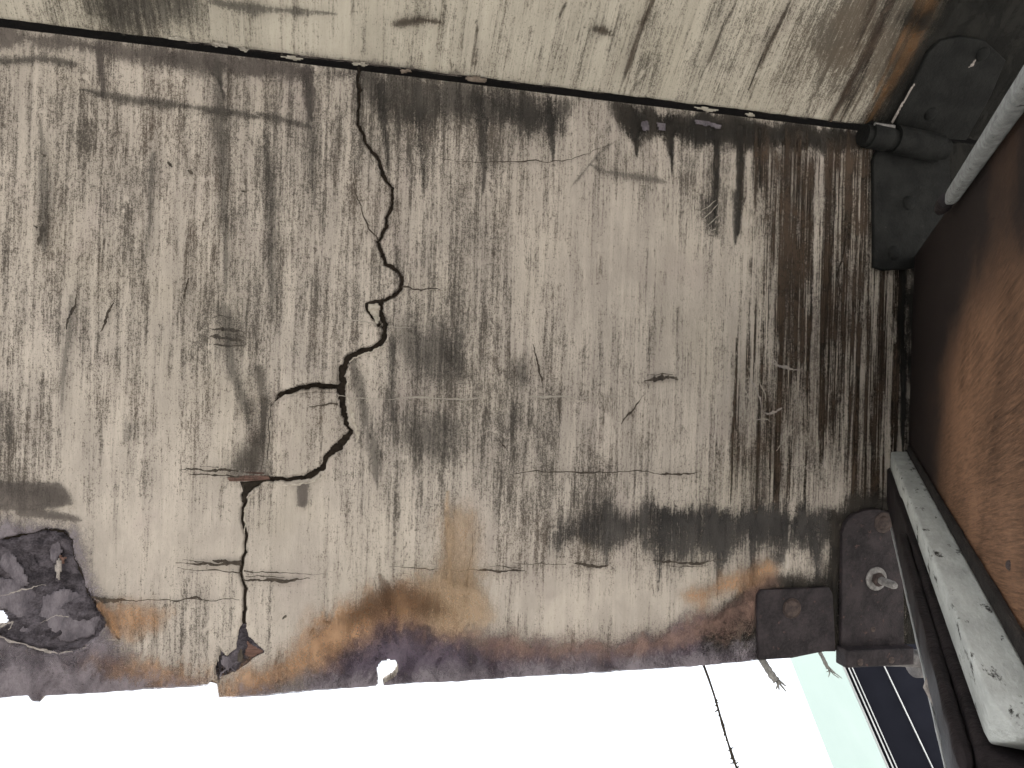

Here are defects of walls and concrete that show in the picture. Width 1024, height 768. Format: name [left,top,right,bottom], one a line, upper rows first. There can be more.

crack [66,295,77,330]
crack [91,67,443,640]
water stain [230,0,1024,698]
spalling [0,527,128,654]
corrosion [91,663,204,689]
spalling [215,624,264,679]
corrosion [219,561,775,698]